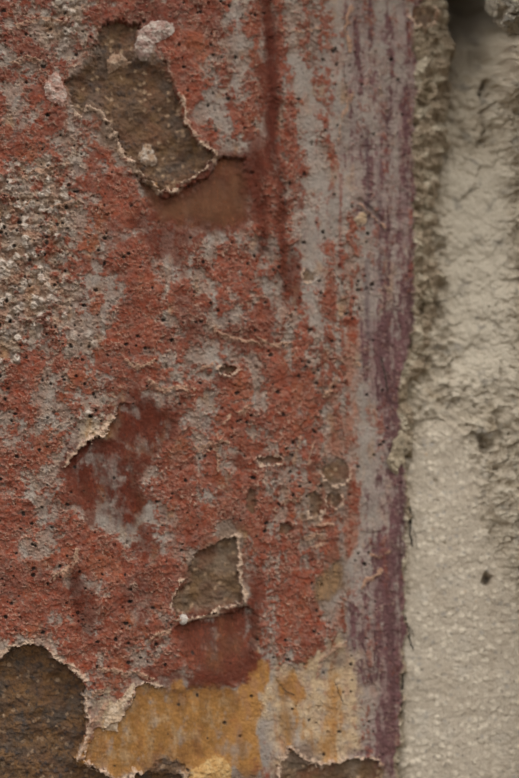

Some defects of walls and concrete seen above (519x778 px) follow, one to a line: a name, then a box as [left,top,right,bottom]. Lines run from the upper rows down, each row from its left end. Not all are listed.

flaking render [64,22,221,197]
peeling [62,401,170,531]
flaking render [146,533,256,674]
flaking render [0,637,235,778]